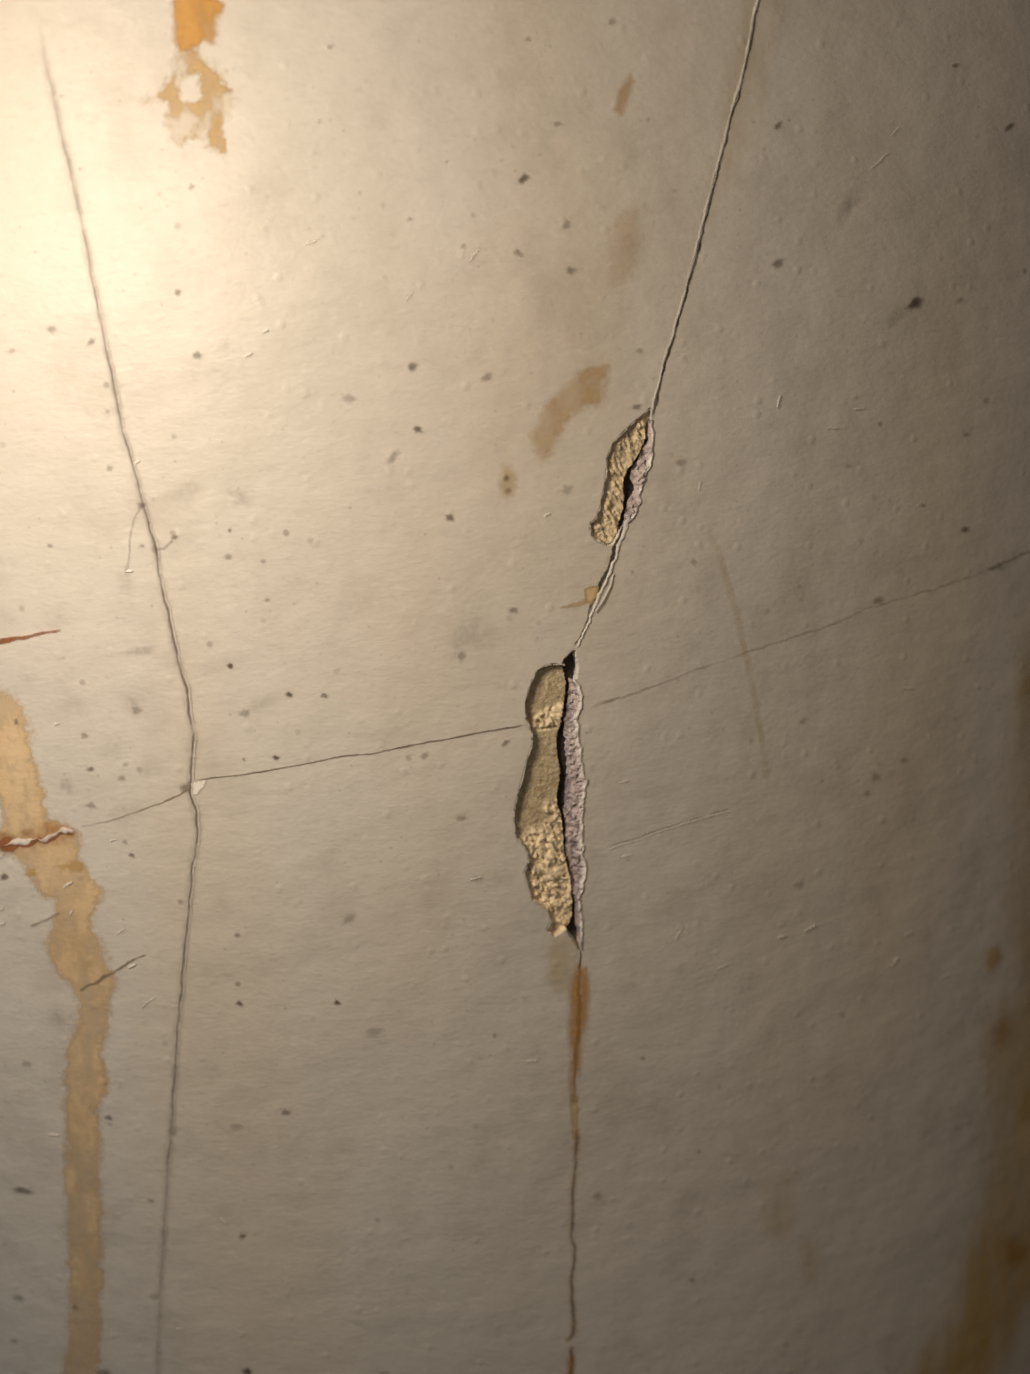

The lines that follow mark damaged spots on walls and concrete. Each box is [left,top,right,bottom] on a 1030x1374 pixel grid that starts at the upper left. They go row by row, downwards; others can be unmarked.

crack [653,0,760,411]
spalling [589,408,656,546]
crack [575,518,629,646]
crack [162,591,215,817]
crack [311,727,508,763]
spalling [513,652,589,950]
water stain [0,694,114,1374]
corrosion [570,967,587,1139]
crack [567,1131,578,1340]